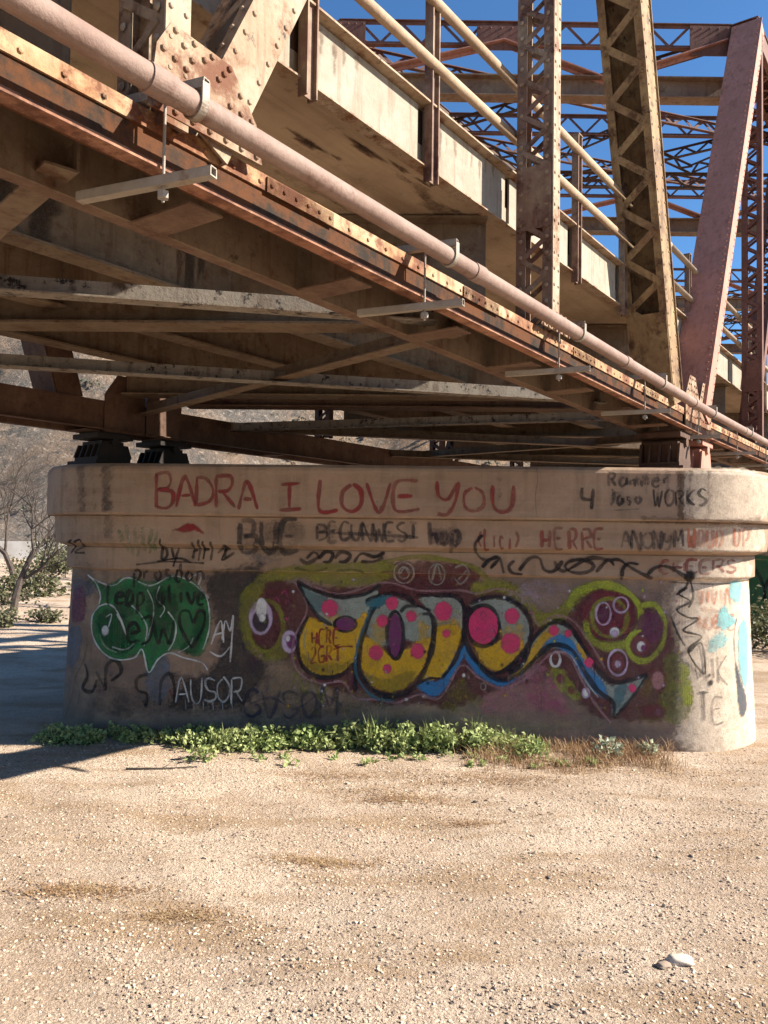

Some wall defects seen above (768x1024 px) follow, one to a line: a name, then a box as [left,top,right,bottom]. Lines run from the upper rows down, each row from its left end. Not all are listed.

rust [0,178,14,202]
rust [30,198,60,238]
rust [178,250,204,286]